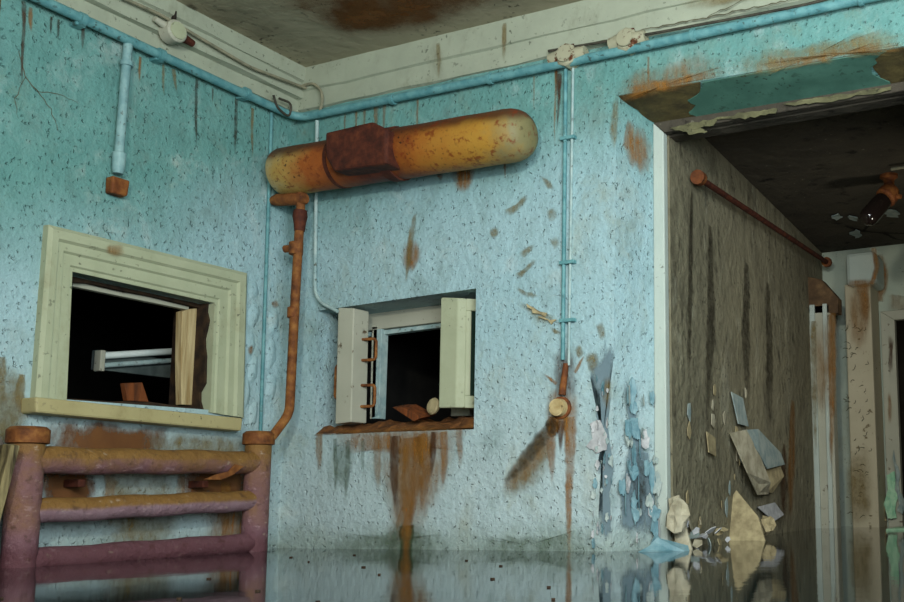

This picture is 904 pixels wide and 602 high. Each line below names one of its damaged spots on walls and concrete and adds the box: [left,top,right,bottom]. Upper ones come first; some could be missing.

damp [332,0,474,28]
rust [805,37,873,61]
peeling [619,47,904,135]
rust [406,231,418,272]
rust [548,416,575,466]
peeling [577,348,662,548]
rust [353,431,447,544]